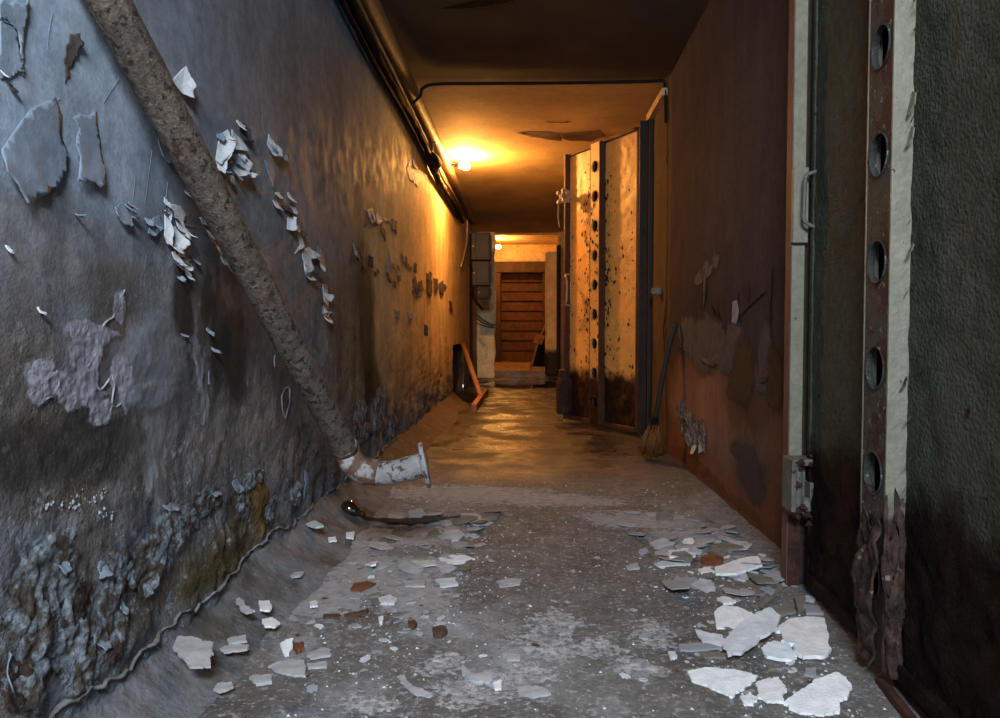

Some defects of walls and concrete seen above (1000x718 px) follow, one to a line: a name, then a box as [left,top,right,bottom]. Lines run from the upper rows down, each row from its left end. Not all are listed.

peeling [0,0,29,93]
peeling [63,33,85,84]
peeling [173,66,197,99]
peeling [1,97,106,205]
peeling [115,197,233,282]
peeling [215,120,334,323]
peeling [353,208,453,311]
flaking render [678,254,743,377]
spalling [264,493,277,527]
spalling [0,464,264,718]